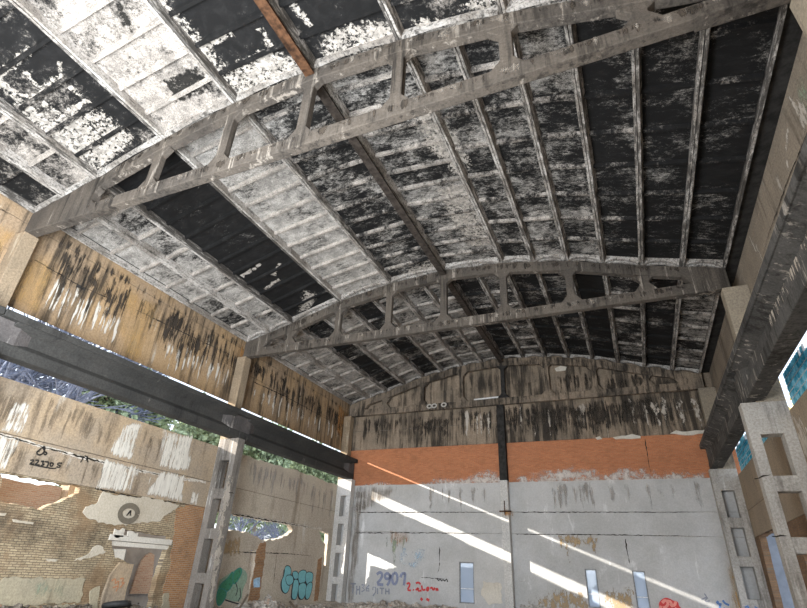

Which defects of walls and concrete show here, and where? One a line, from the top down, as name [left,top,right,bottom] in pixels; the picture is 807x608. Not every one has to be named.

peeling [0,45,134,171]
water stain [19,238,237,386]
water stain [557,373,592,392]
water stain [363,396,702,443]
crack [0,433,206,484]
water stain [82,423,142,491]
water stain [147,432,198,505]
crack [95,488,190,505]
peeling [76,545,106,560]
spalling [82,491,203,608]
peeling [0,576,100,608]